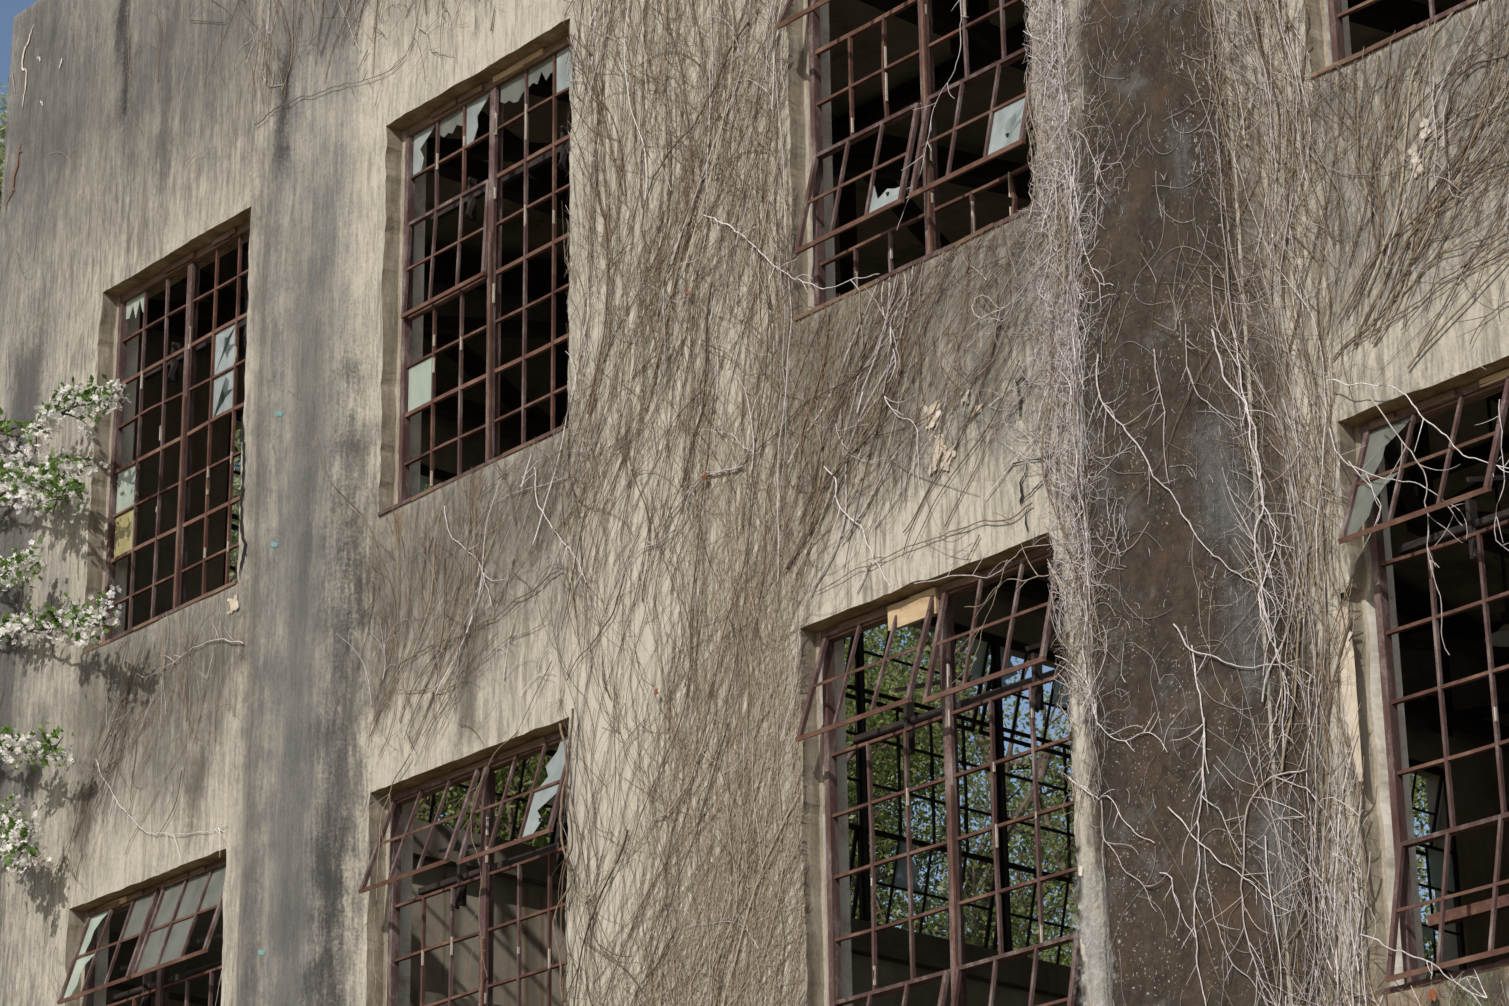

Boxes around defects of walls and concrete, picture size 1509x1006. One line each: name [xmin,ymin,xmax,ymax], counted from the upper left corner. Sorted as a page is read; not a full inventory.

water stain [116,0,129,114]
water stain [306,416,365,1006]
water stain [1071,0,1329,1006]